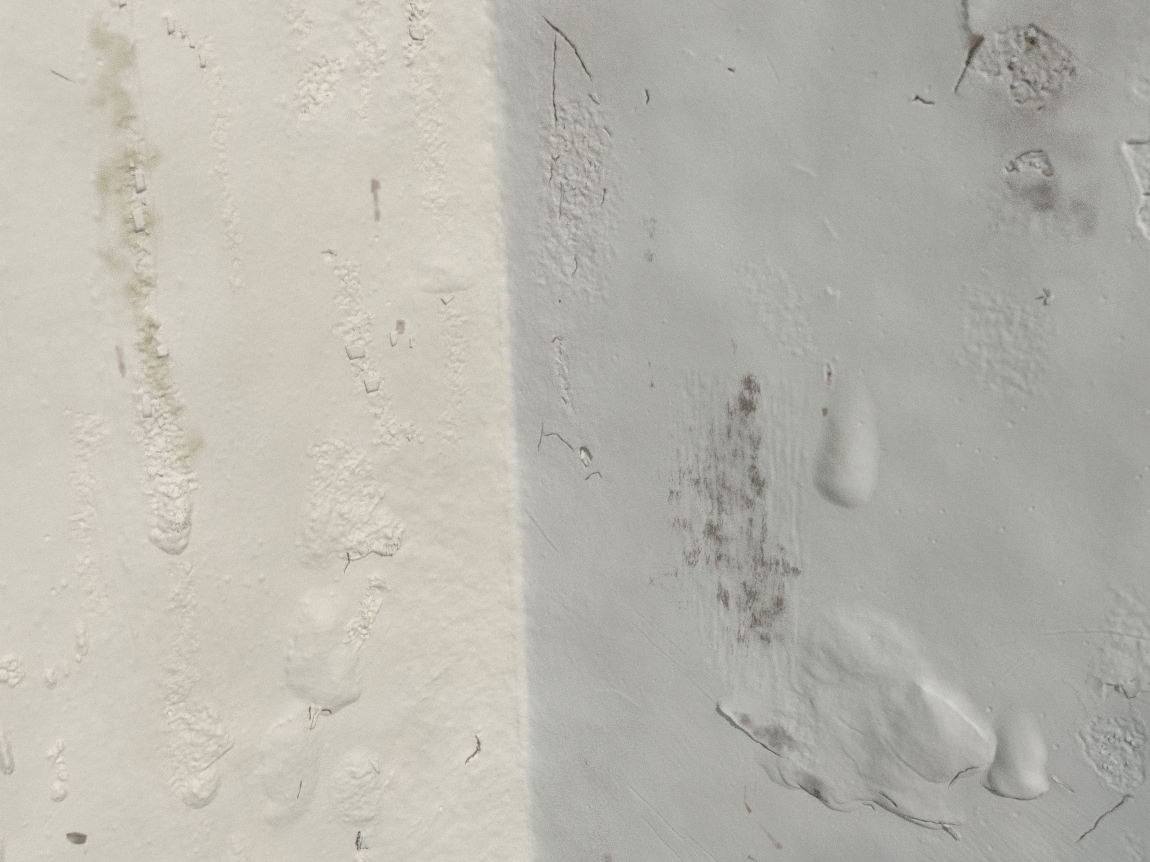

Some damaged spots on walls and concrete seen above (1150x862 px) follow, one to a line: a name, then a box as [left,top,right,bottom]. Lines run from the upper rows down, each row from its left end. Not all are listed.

peeling [966,15,1087,116]
mould [668,377,801,648]